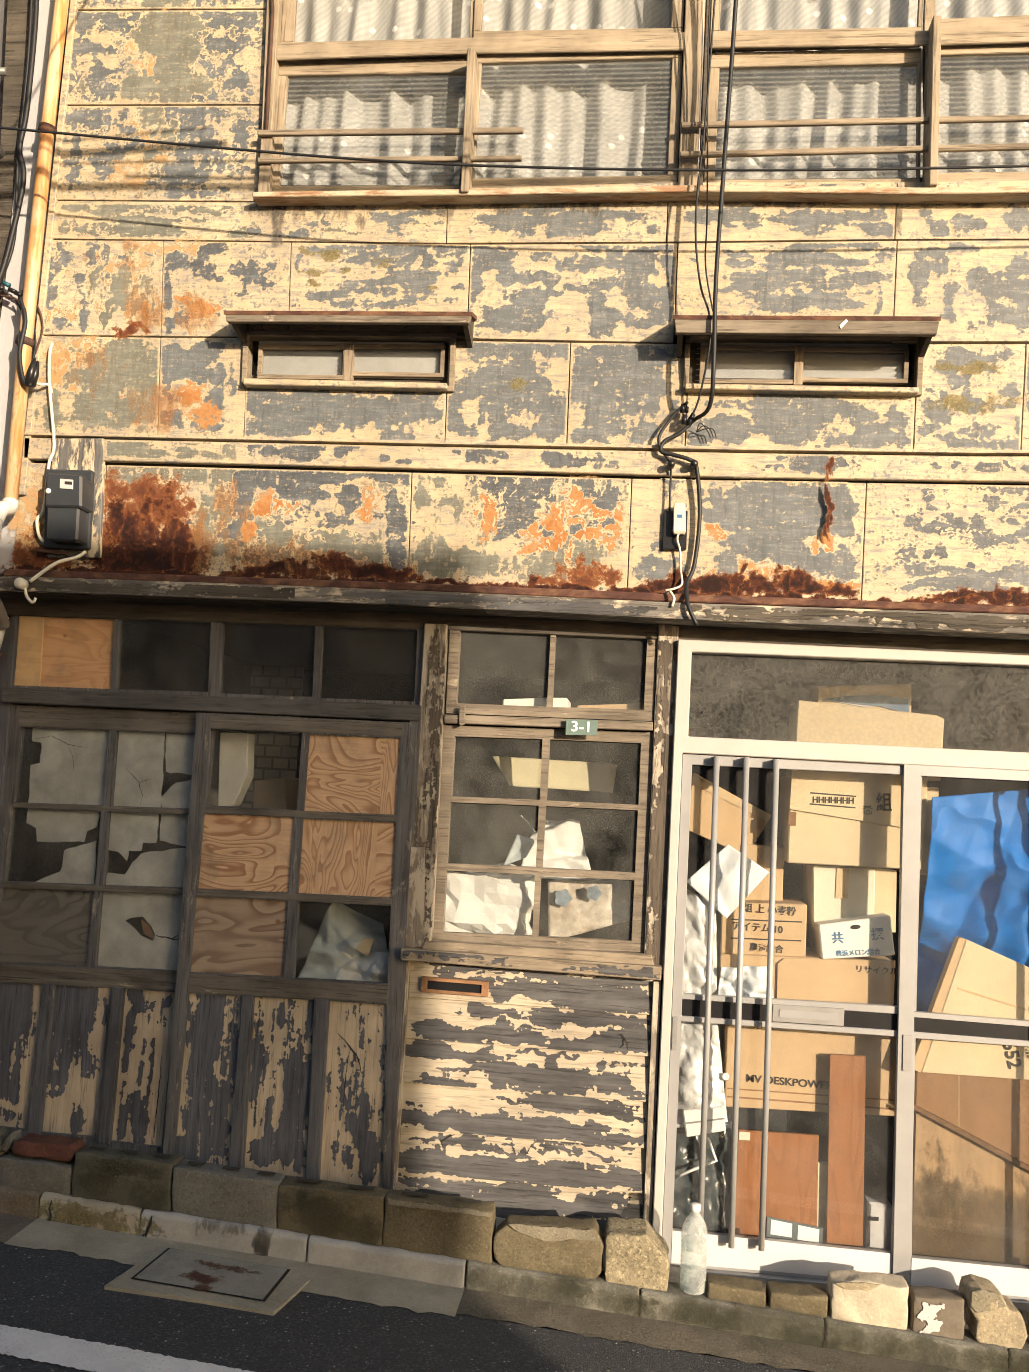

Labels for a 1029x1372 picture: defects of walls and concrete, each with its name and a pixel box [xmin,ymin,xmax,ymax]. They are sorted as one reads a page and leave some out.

peeling [0,0,1029,632]
rust [0,456,1029,606]
peeling [0,982,108,1152]
peeling [116,629,676,1242]